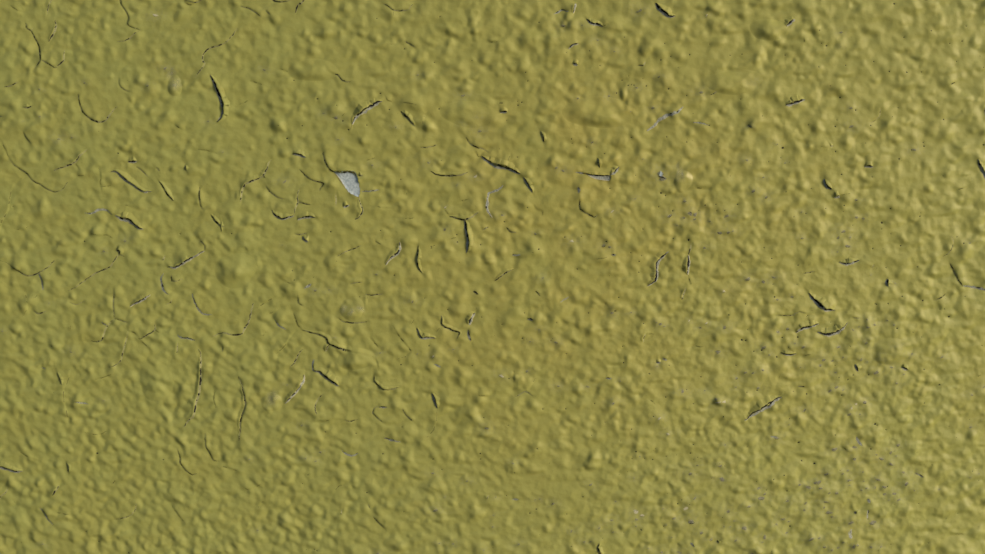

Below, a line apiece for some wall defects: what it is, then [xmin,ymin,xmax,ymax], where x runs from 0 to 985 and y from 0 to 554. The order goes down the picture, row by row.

crack [14,0,65,68]
crack [195,0,305,123]
crack [0,82,174,330]
peeling [323,154,364,220]
crack [576,158,619,218]
crack [977,159,985,178]
crack [92,74,543,490]
crack [647,246,691,299]
crack [781,271,858,356]
crack [745,386,805,421]